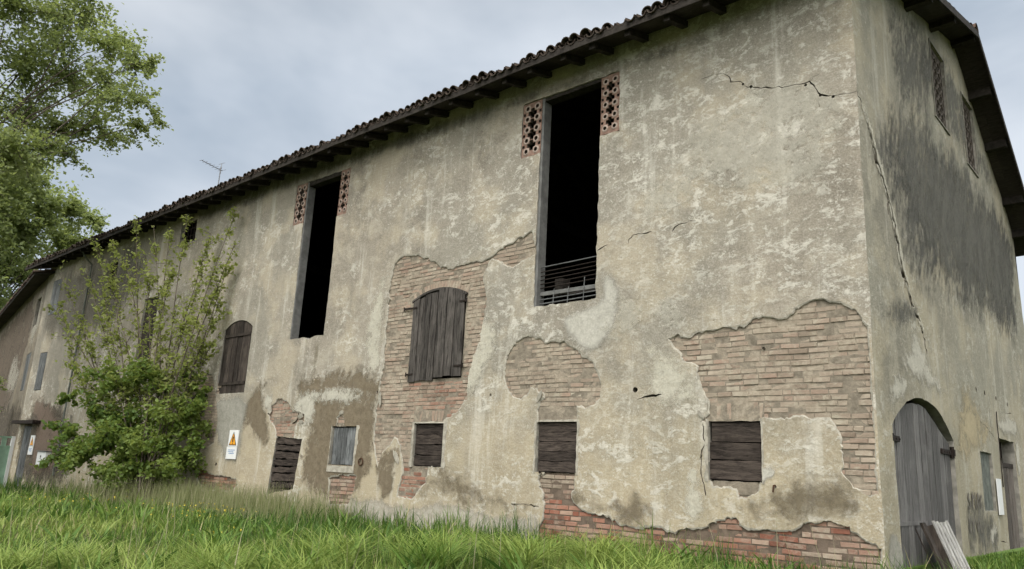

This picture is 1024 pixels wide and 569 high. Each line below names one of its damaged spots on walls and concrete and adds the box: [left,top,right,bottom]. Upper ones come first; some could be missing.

crack [703,73,927,352]
damp [877,22,1015,330]
damp [244,384,273,444]
spalling [267,398,304,440]
spalling [328,473,357,506]
damp [294,277,399,498]
spalling [361,230,536,500]
spalling [503,334,601,423]
spalling [511,472,883,569]
spalling [667,298,879,499]